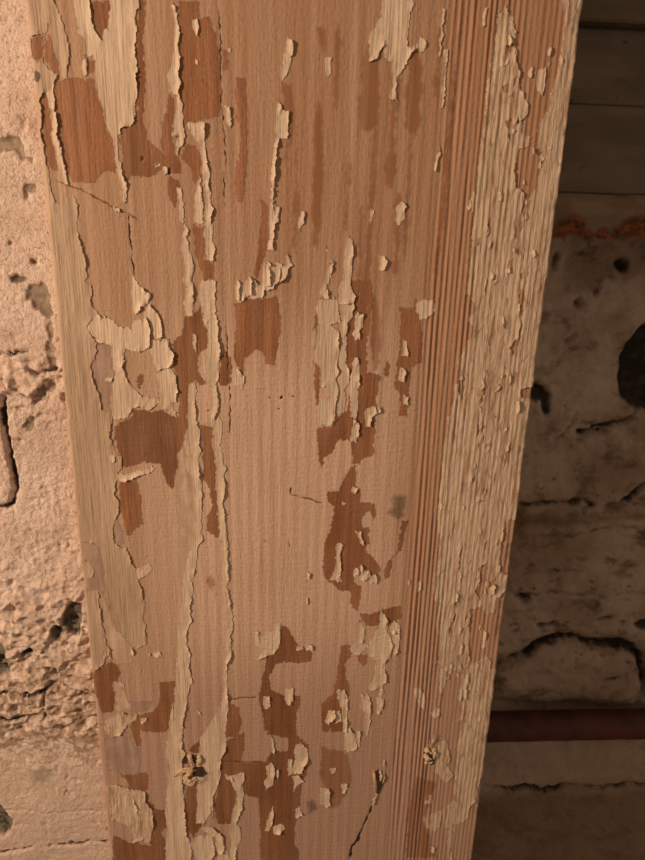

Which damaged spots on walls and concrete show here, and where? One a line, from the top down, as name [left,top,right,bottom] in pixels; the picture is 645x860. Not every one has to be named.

peeling [368,0,426,101]
peeling [395,202,406,225]
rust [552,215,645,242]
peeling [0,0,313,860]
peeling [424,0,583,860]
peeling [312,236,435,752]
peeling [413,687,443,718]
peeling [319,787,330,808]
crack [349,805,372,857]